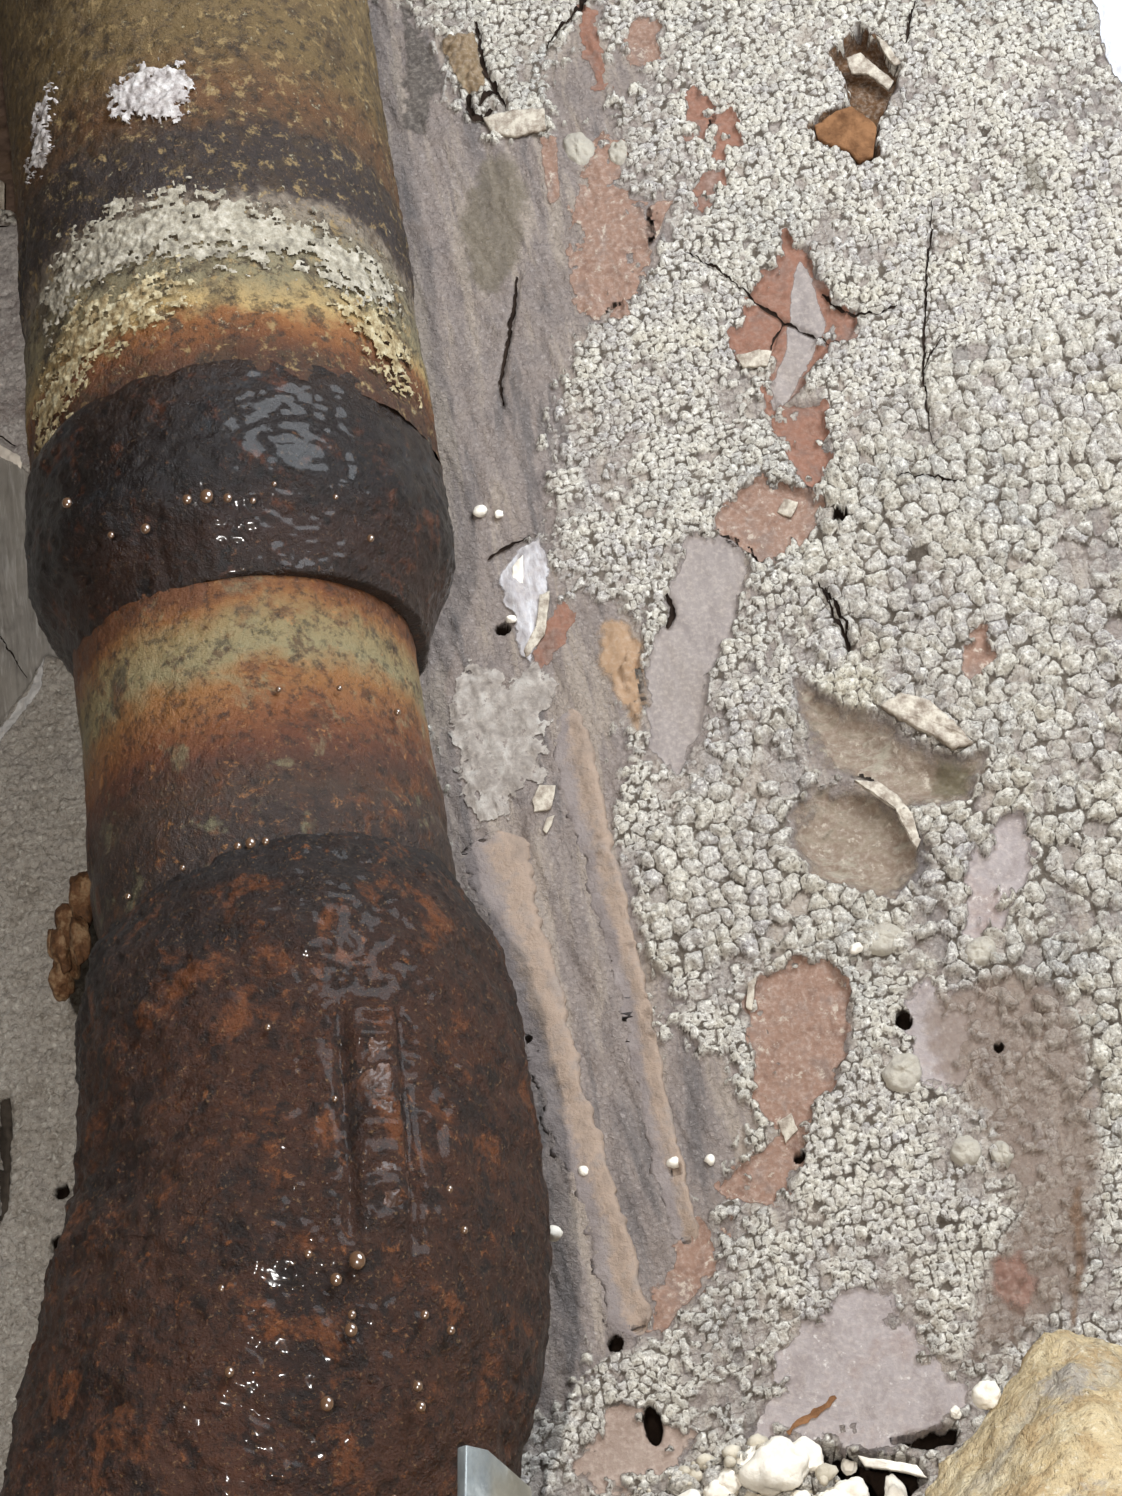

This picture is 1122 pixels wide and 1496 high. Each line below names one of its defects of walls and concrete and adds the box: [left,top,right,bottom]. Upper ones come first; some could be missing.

crack [466,21,506,122]
crack [547,0,587,48]
spalling [807,28,901,165]
crack [498,277,518,406]
crack [686,200,965,482]
crack [0,636,27,678]
peeling [0,444,57,741]
peeling [448,536,576,834]
peeling [643,228,858,775]
spalling [792,688,979,896]
spalling [642,1406,663,1446]
spalling [754,1287,1122,1496]